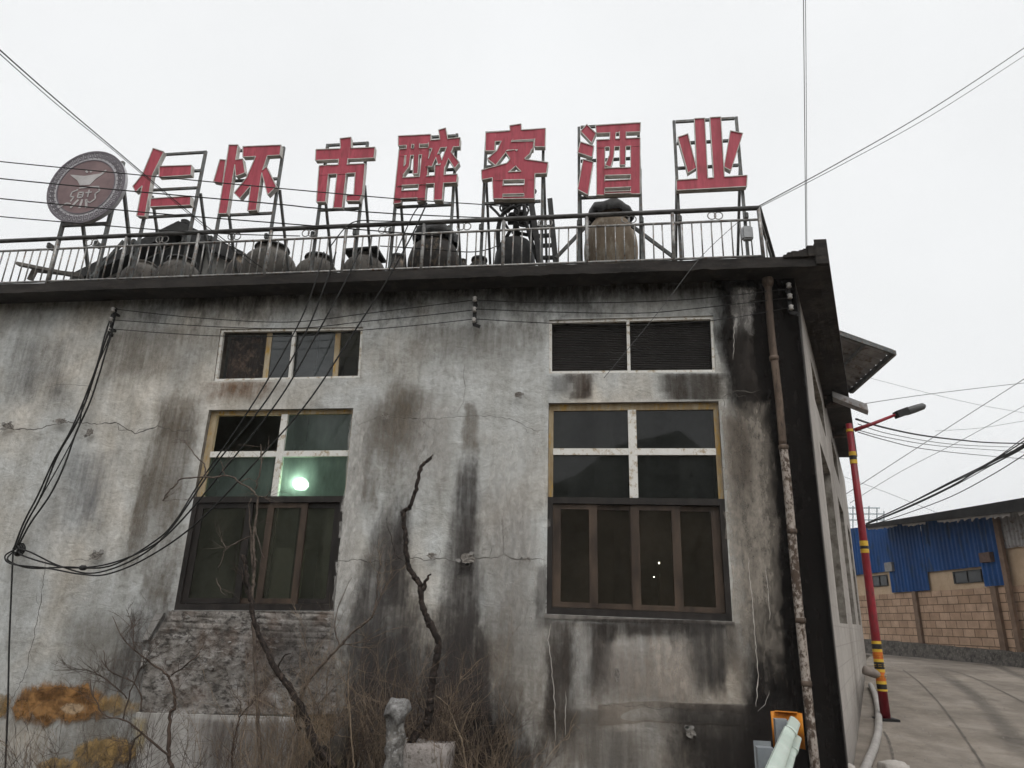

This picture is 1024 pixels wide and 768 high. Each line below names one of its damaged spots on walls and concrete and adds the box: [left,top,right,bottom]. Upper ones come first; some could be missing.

crack [0,384,190,434]
leakage [563,373,591,398]
leakage [665,373,723,399]
leakage [732,308,775,497]
leakage [143,406,192,528]
crack [334,514,546,567]
leakage [340,466,528,768]
leakage [546,621,601,737]
leakage [587,619,734,688]